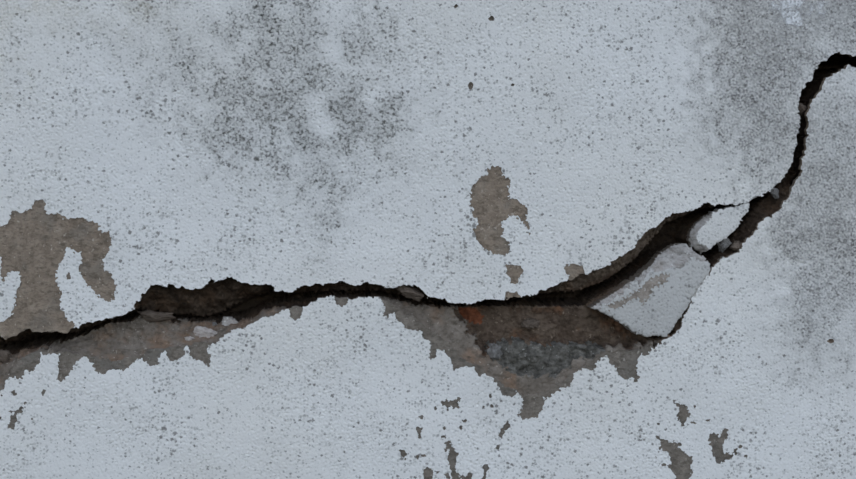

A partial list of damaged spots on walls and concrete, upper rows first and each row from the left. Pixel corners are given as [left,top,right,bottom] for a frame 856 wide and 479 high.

crack [0,55,856,354]
peeling [0,200,303,429]
spalling [380,165,677,450]
peeling [673,400,710,429]
peeling [399,426,489,479]
peeling [655,423,693,479]
peeling [708,428,747,464]